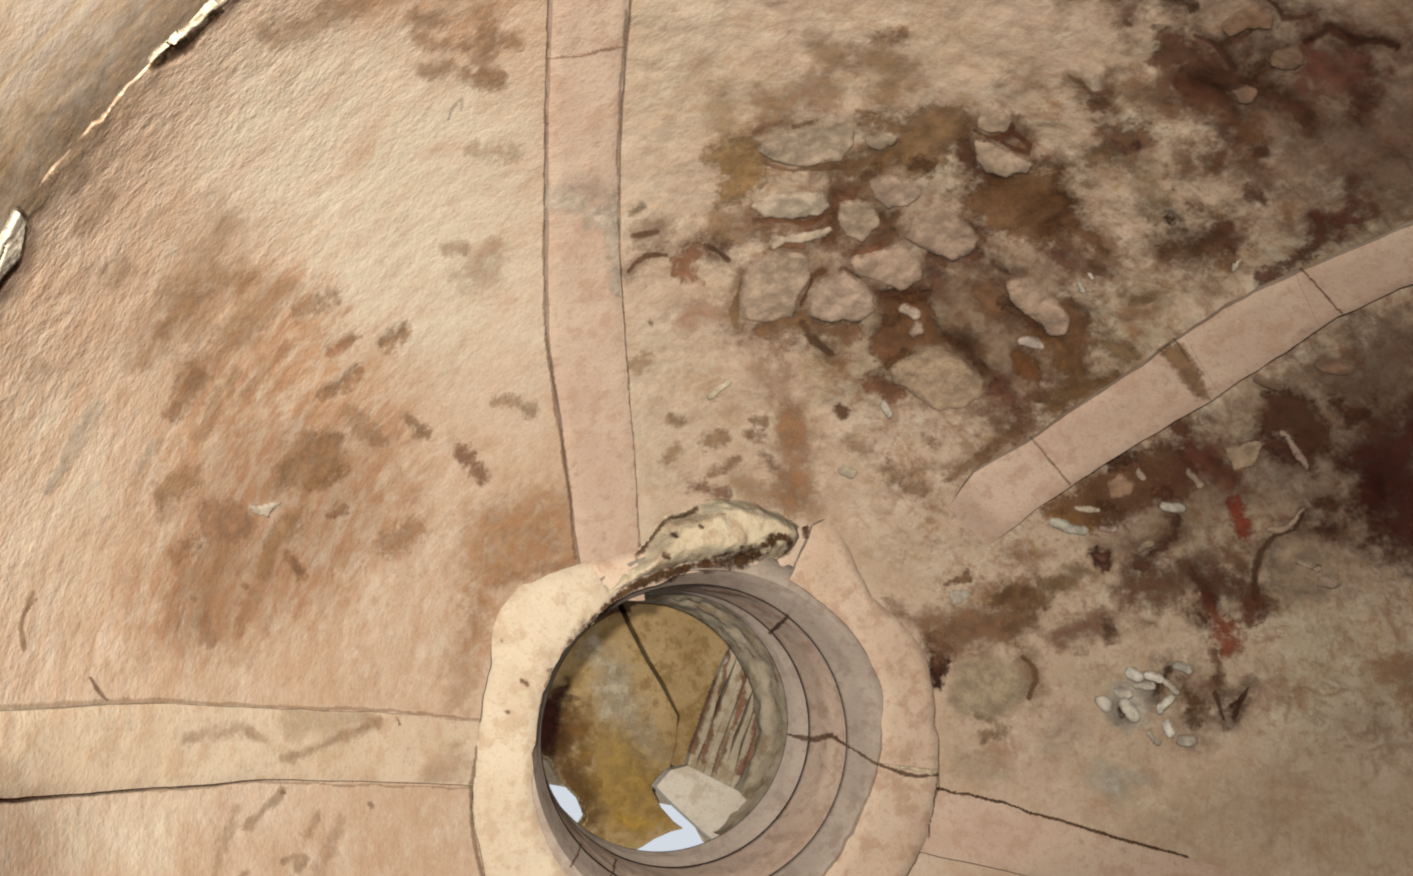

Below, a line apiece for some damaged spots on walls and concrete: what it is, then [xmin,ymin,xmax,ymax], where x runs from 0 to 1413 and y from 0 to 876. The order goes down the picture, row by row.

flaking render [1148,25,1317,136]
flaking render [1085,123,1154,165]
flaking render [0,206,27,287]
flaking render [670,105,1140,462]
flaking render [1158,209,1242,272]
flaking render [1041,378,1413,619]
flaking render [944,568,972,605]
flaking render [924,633,954,689]
crack [786,733,1188,858]